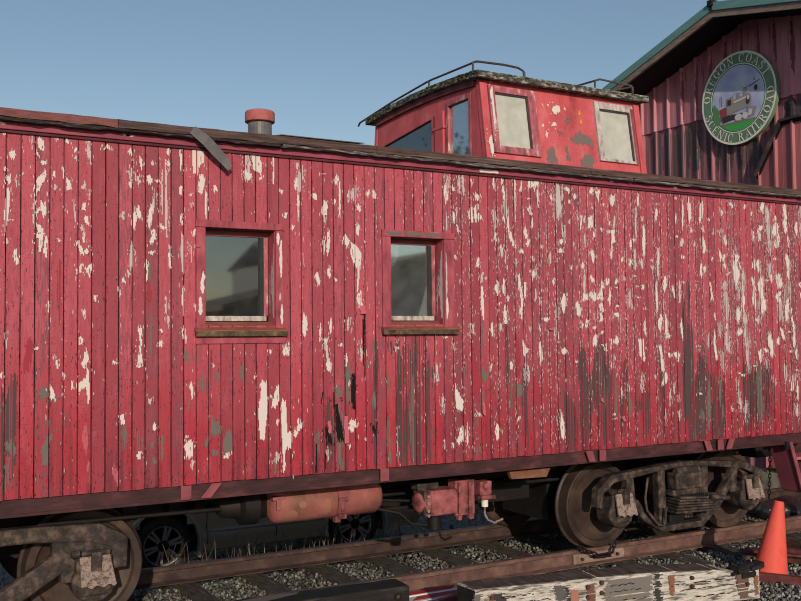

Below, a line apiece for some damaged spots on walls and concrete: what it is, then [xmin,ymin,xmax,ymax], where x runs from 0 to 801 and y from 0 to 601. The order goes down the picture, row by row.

water stain [653,51,763,183]
peeling [22,136,73,258]
peeling [35,336,95,404]
peeling [128,204,170,283]
peeling [165,148,218,219]
peeling [185,365,302,474]
peeling [342,224,365,308]
water stain [372,334,437,468]
peeling [559,275,619,352]
water stain [564,337,650,451]
water stain [682,274,725,441]
peeling [674,187,801,422]